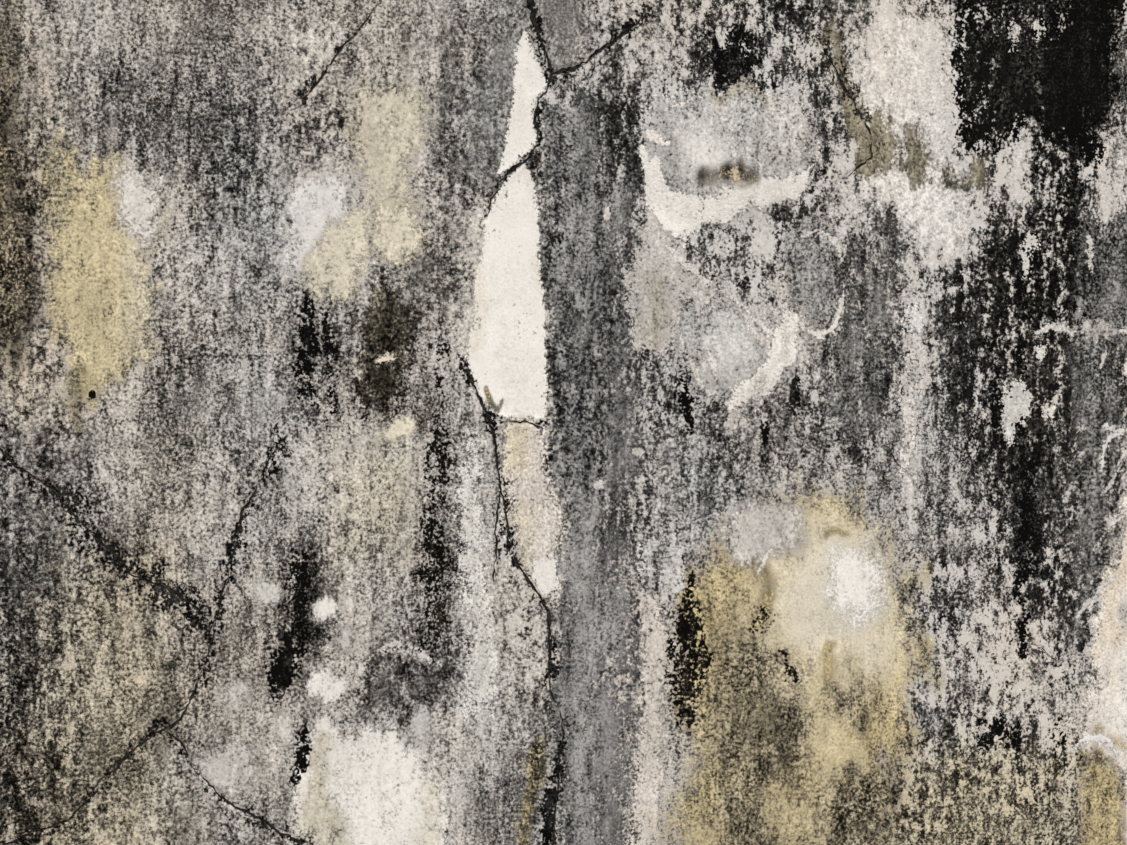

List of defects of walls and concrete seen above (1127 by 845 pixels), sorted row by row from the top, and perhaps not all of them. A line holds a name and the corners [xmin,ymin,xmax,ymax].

crack [297,8,375,104]
crack [480,0,655,224]
crack [0,414,313,845]
spalling [453,30,565,731]
crack [456,354,568,845]
water stain [716,498,809,575]
water stain [760,421,775,448]
water stain [789,377,801,415]
water stain [813,0,1127,845]